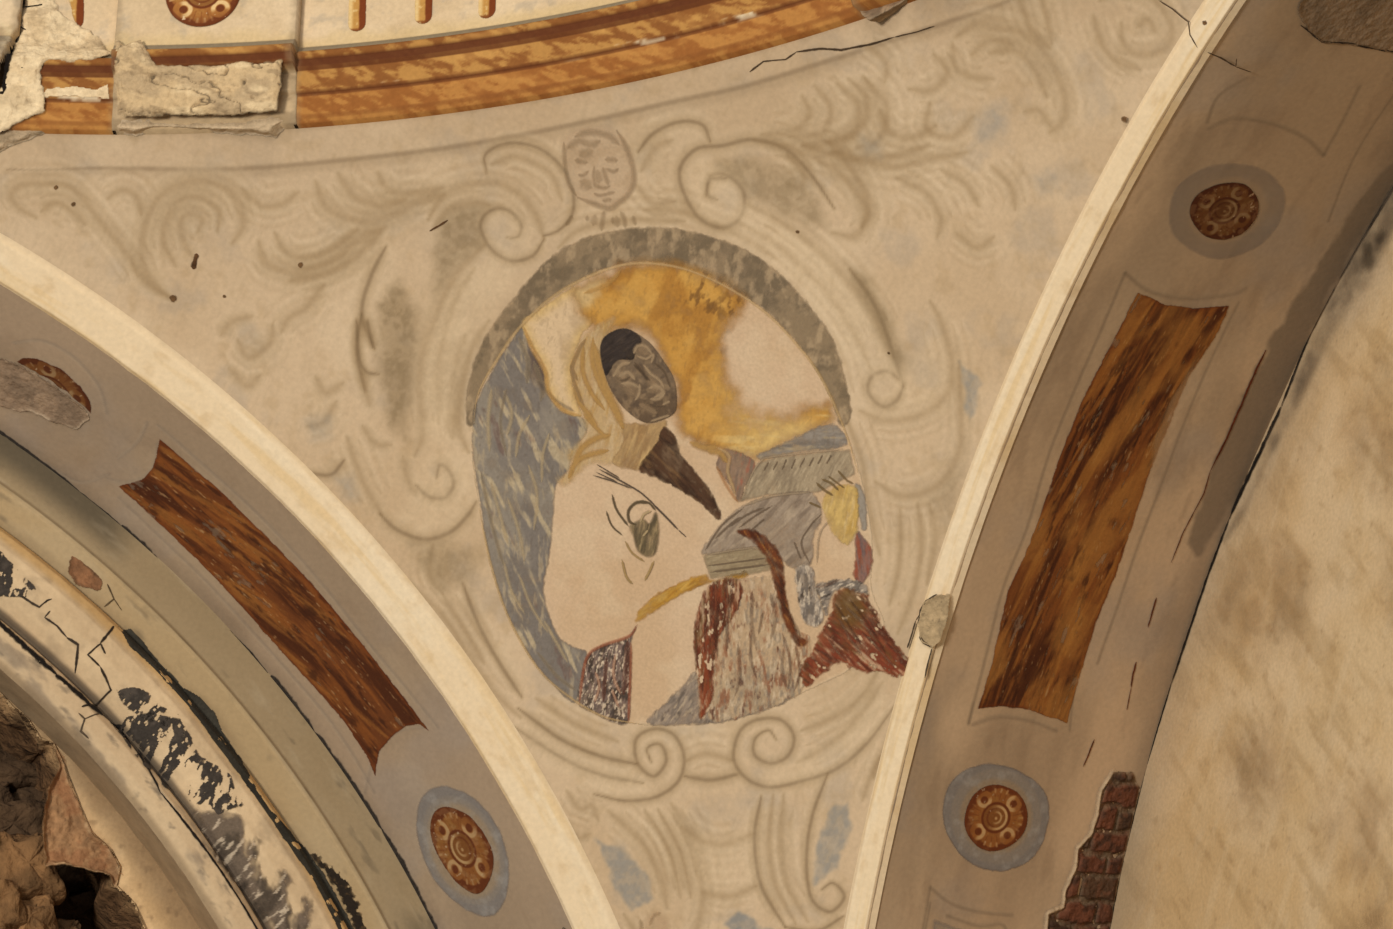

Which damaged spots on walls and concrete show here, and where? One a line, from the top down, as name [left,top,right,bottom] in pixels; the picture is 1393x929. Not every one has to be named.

crack [0,0,42,94]
peeling [44,84,109,99]
crack [1160,1,1250,72]
flaking render [1298,0,1393,53]
crack [0,431,156,556]
spalling [0,694,146,929]
crack [0,584,258,929]
crack [235,636,437,929]
mould [310,853,366,929]
flaking render [1044,771,1141,929]